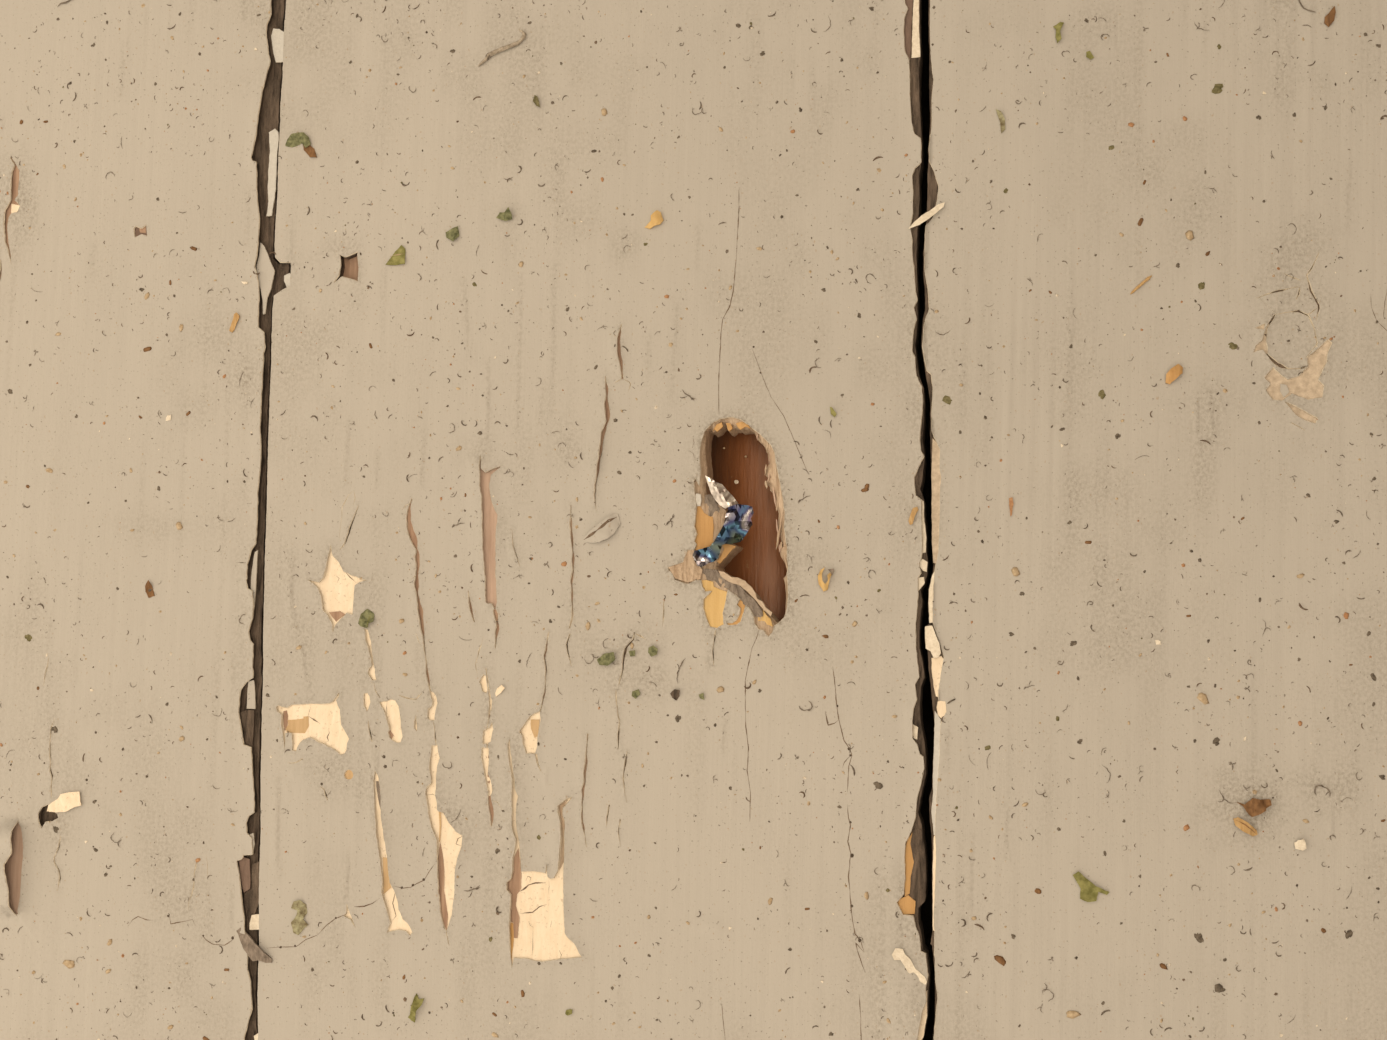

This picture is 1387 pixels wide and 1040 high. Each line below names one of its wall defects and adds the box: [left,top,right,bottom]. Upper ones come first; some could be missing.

peeling [311,550,365,630]
peeling [480,460,500,607]
spalling [669,418,788,636]
peeling [277,694,353,779]
peeling [365,629,437,742]
peeling [480,675,505,796]
peeling [5,822,23,914]
peeling [43,806,58,823]
peeling [374,773,412,934]
peeling [426,745,462,930]
peeling [507,707,581,965]